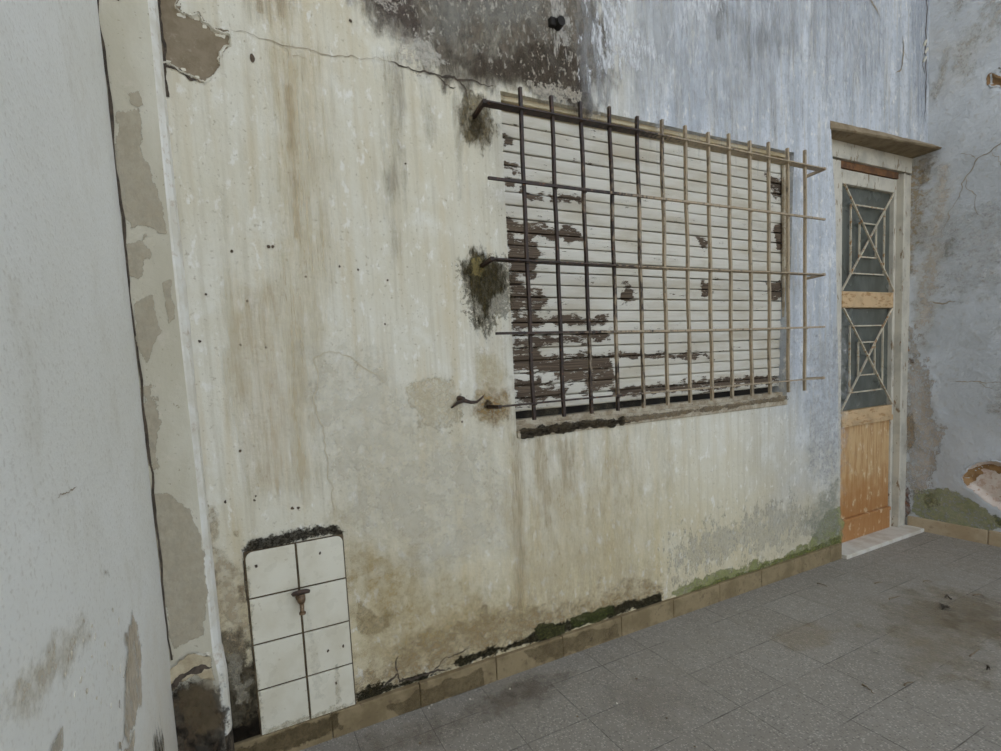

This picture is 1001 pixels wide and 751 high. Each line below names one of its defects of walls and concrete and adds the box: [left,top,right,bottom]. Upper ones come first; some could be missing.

spalling [158,0,232,84]
crack [230,29,493,99]
damp [366,0,796,149]
spalling [986,73,1001,88]
damp [462,246,506,332]
rust [476,389,508,423]
spalling [961,459,1001,510]
peeling [151,493,215,691]
damp [349,558,662,702]
peeling [74,608,142,751]
damp [172,627,260,751]
peeling [52,726,64,751]